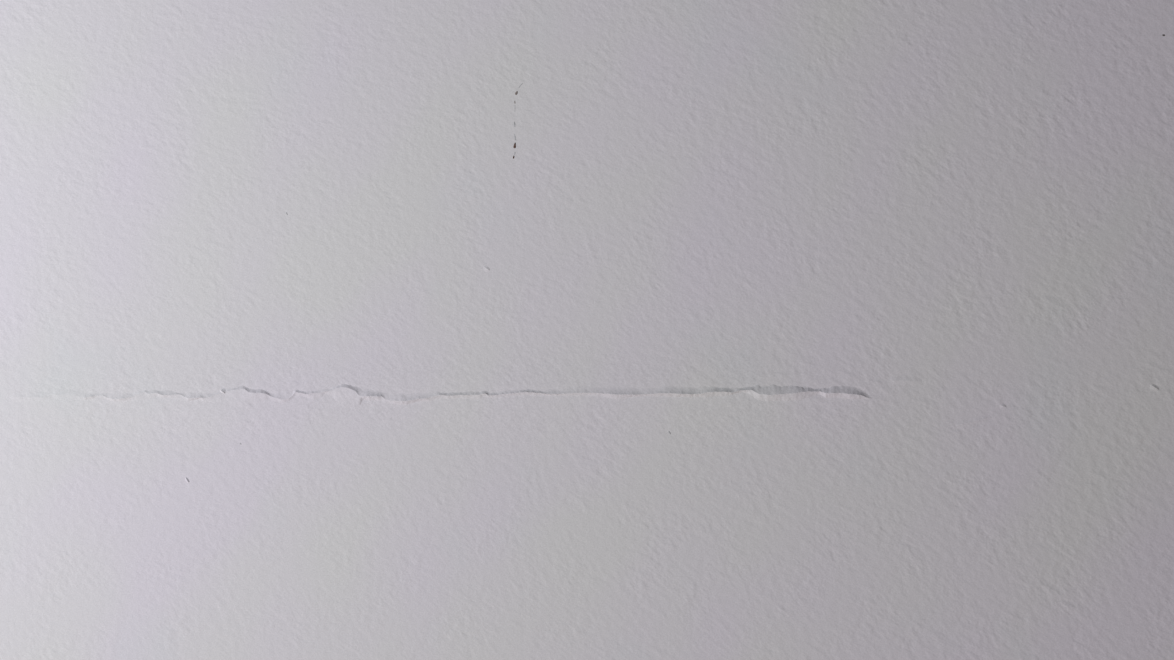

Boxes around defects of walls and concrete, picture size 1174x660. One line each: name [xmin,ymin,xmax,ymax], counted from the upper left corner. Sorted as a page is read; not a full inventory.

crack [9,375,922,408]